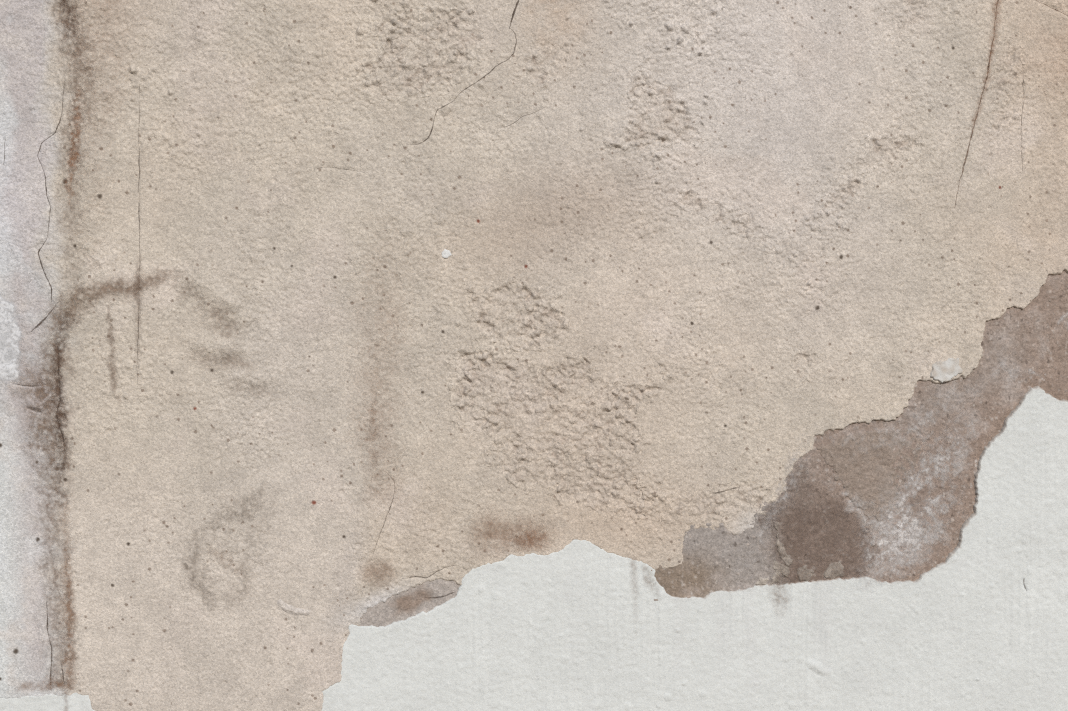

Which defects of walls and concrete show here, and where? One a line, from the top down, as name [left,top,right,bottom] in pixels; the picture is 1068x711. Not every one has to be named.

spalling [353,0,485,111]
water stain [54,277,159,319]
water stain [36,344,69,497]
peeling [445,270,1068,601]
peeling [360,579,460,627]